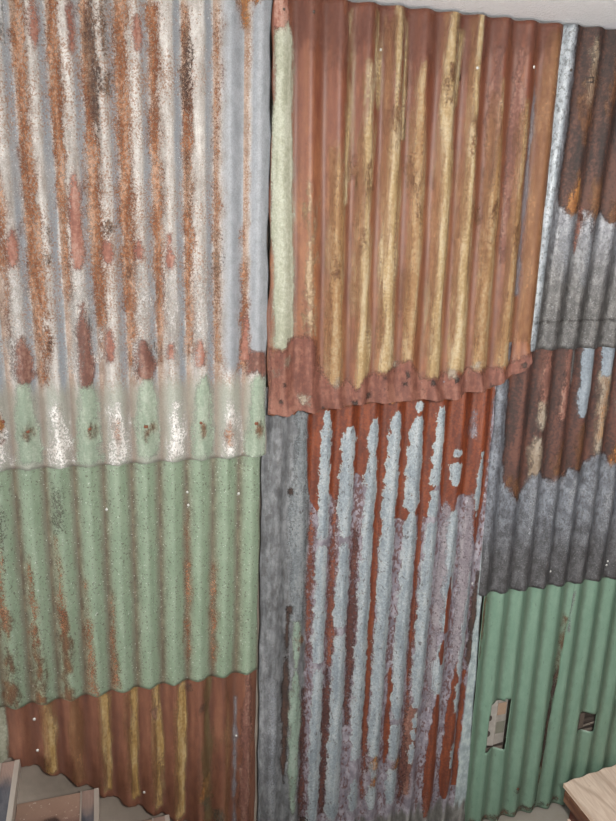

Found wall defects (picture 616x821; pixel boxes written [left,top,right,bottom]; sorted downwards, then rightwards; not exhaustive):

rust [0,0,226,389]
rust [292,0,557,263]
rust [558,25,616,274]
rust [47,403,76,469]
rust [167,400,192,462]
rust [236,222,616,551]
rust [265,609,290,806]
rust [297,688,308,821]
rust [318,668,331,814]
rust [343,529,359,725]
peeling [286,386,496,821]
rust [465,571,487,669]